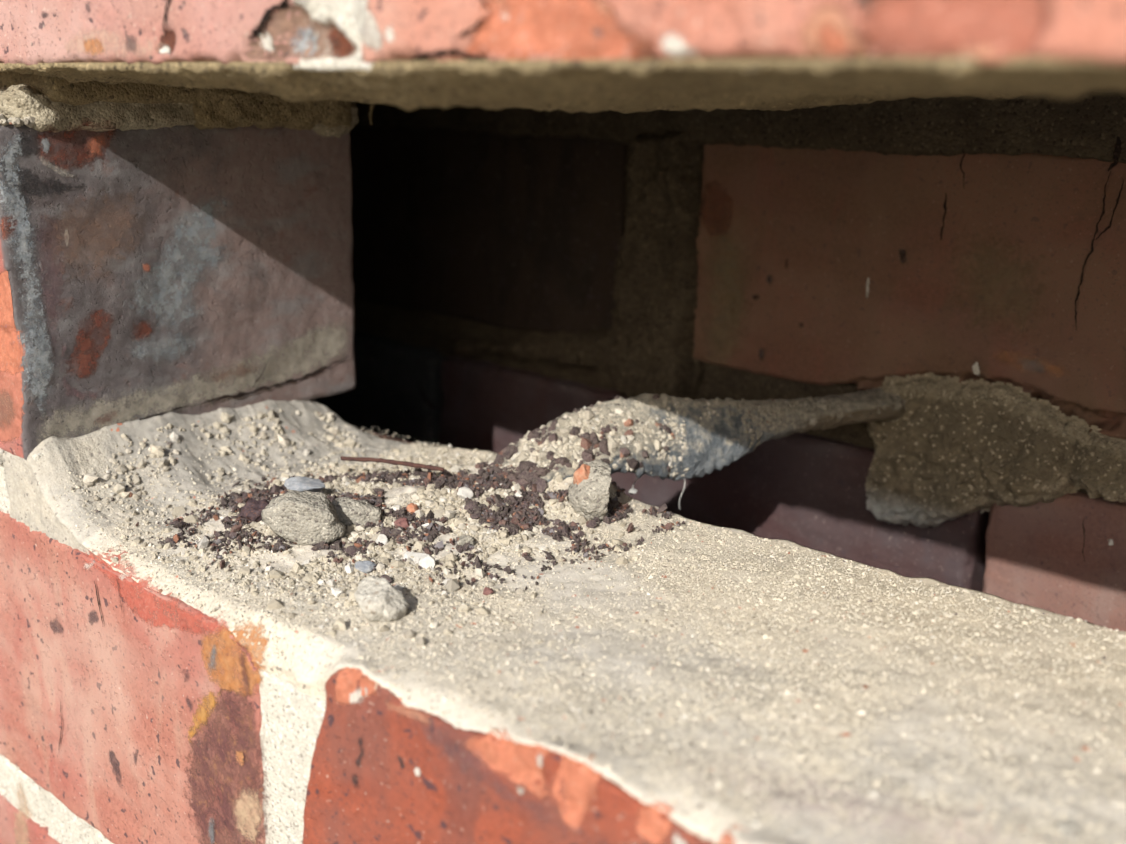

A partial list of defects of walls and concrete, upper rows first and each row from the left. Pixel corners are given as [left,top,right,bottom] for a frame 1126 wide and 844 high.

crack [162,0,170,38]
spalling [246,4,357,61]
spalling [466,0,658,60]
crack [940,149,965,240]
crack [1075,136,1124,330]
water stain [0,133,348,443]
spalling [0,270,29,442]
spalling [335,667,394,704]
spalling [464,728,602,833]
spalling [636,802,673,844]